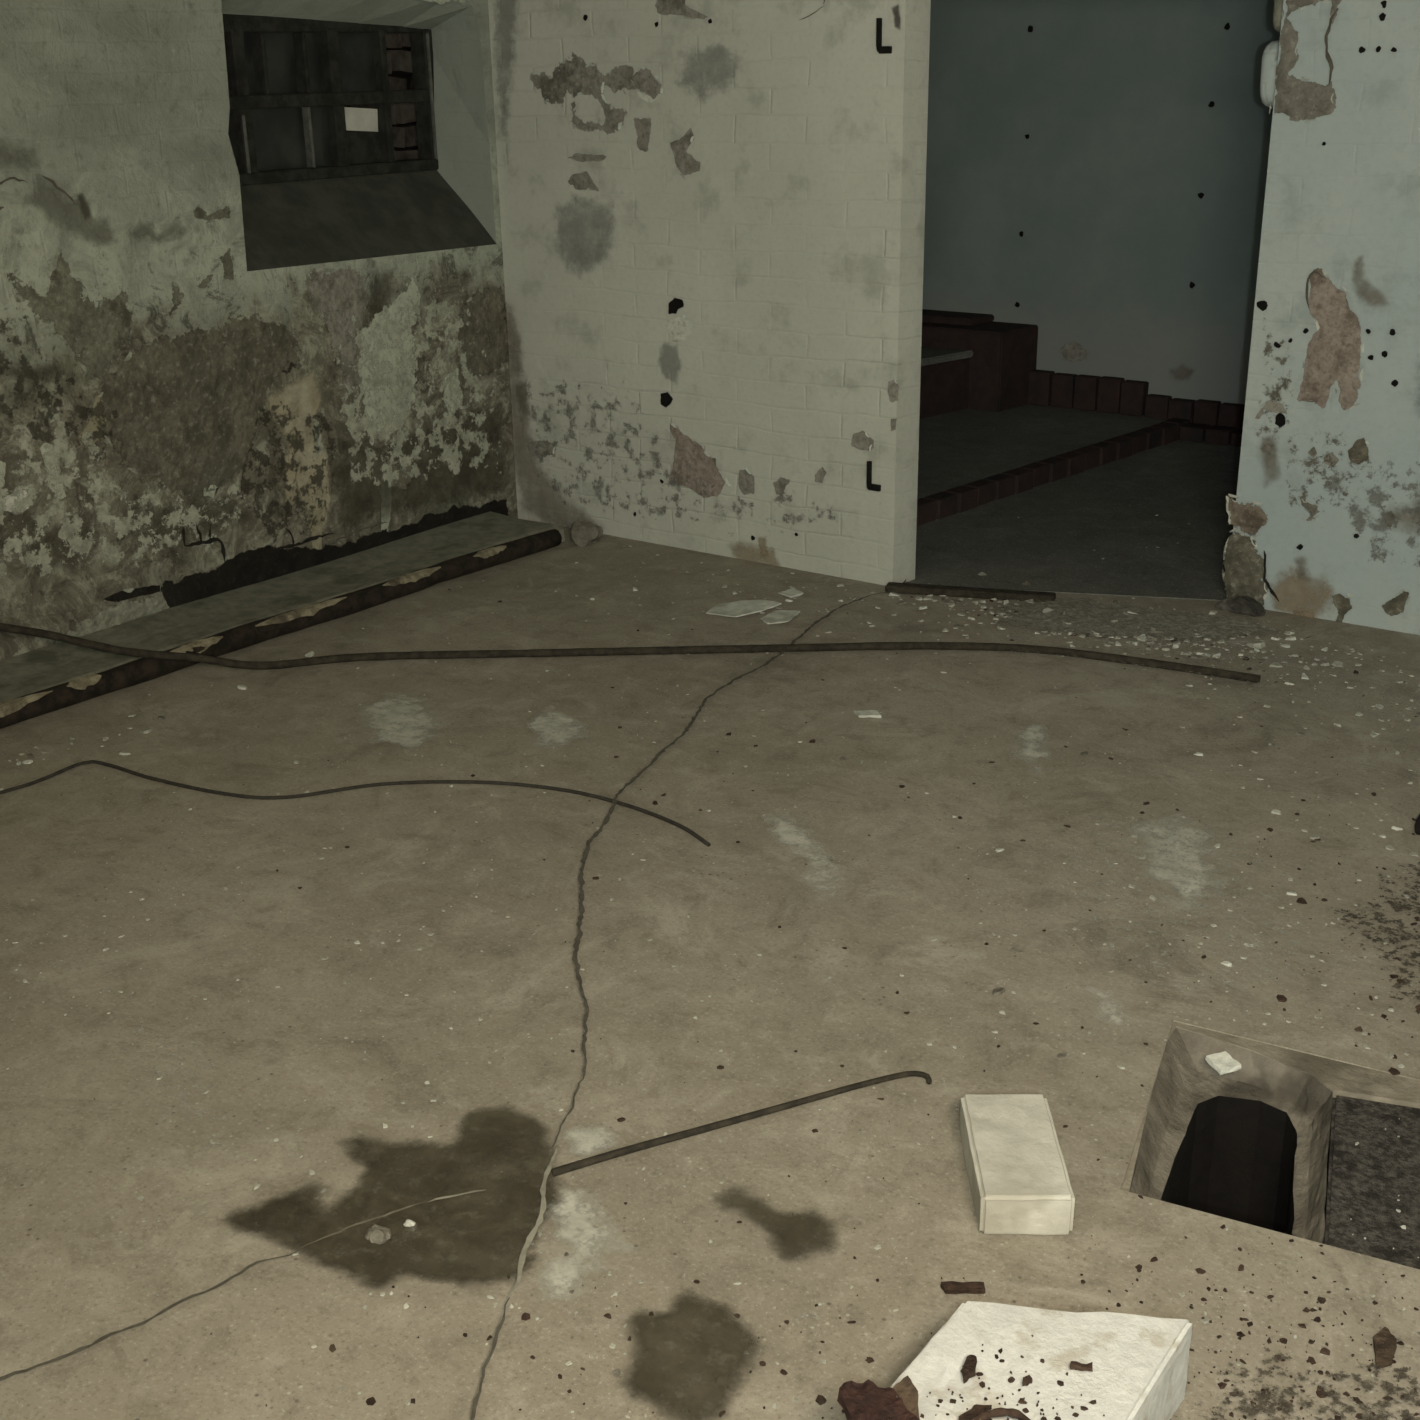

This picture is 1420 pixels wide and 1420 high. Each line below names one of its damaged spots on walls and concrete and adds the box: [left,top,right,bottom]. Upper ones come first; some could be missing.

spalling [530,52,664,152]
spalling [1269,0,1342,123]
peeling [1255,268,1395,427]
spalling [0,248,509,608]
damp [268,274,753,550]
spalling [660,392,755,498]
damp [5,513,92,566]
spalling [1221,494,1268,611]
crack [471,564,918,1420]
damp [228,1108,610,1296]
damp [722,1189,833,1259]
damp [628,1295,754,1420]